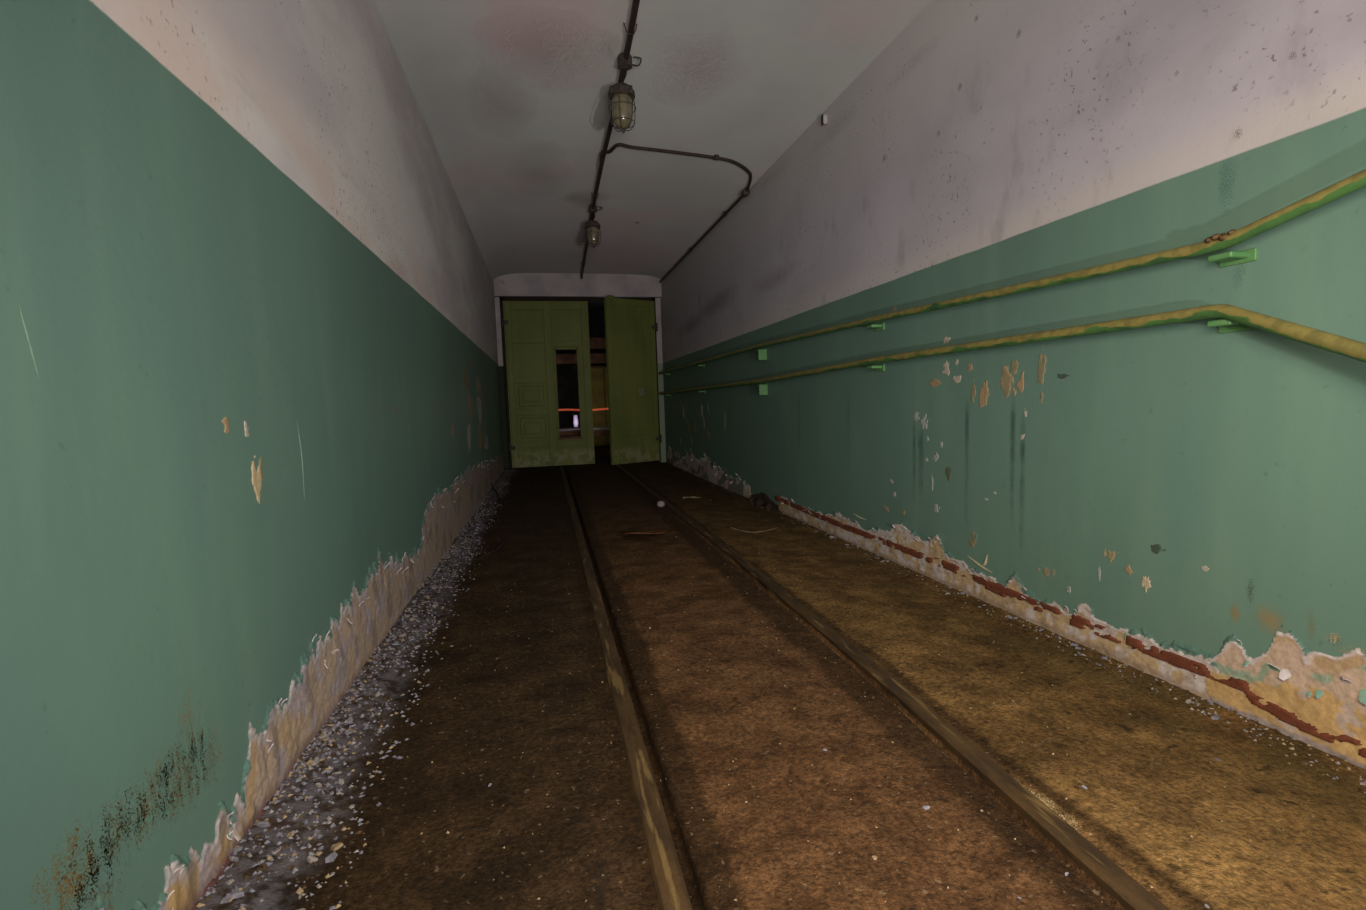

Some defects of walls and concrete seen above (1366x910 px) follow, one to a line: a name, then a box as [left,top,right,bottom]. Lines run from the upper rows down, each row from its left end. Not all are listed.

peeling [779,479,1366,769]